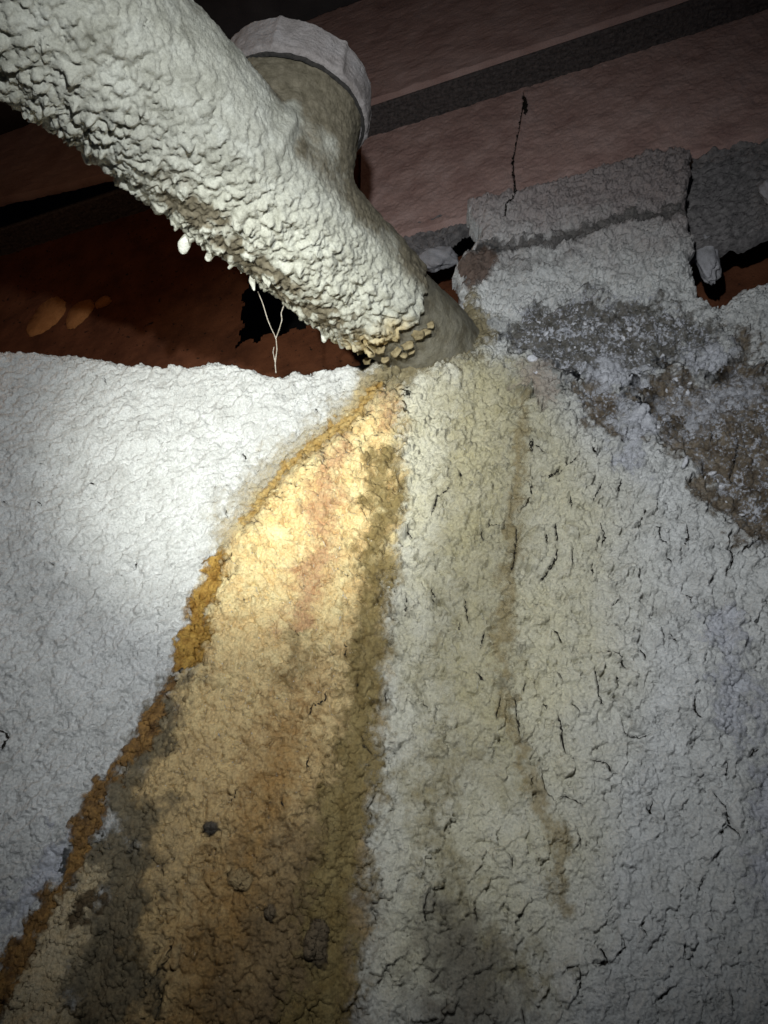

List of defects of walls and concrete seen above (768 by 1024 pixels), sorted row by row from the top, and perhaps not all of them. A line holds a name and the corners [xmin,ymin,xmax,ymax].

crack [504,95,528,216]
crack [431,473,462,515]
crack [481,438,597,573]
crack [540,479,622,581]
crack [640,510,690,565]
crack [686,530,759,603]
damp [0,363,429,1024]
crack [458,601,484,680]
crack [496,627,677,754]
crack [531,768,581,845]
crack [699,749,759,890]
crack [564,922,647,995]